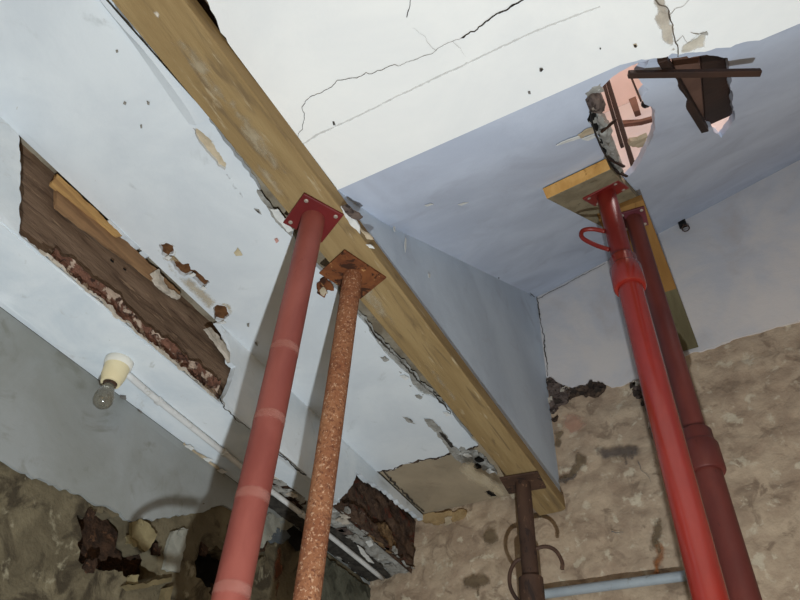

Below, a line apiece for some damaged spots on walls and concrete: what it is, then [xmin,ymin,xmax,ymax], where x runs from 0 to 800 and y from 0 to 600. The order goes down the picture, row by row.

flaking render [196,129,226,167]
crack [298,0,523,134]
spalling [556,84,628,177]
spalling [628,133,648,148]
flaking render [19,142,231,399]
flaking render [0,461,232,600]
flaking render [250,476,308,600]
flaking render [326,419,522,600]
flaking render [533,377,691,600]
flaking render [685,322,800,600]